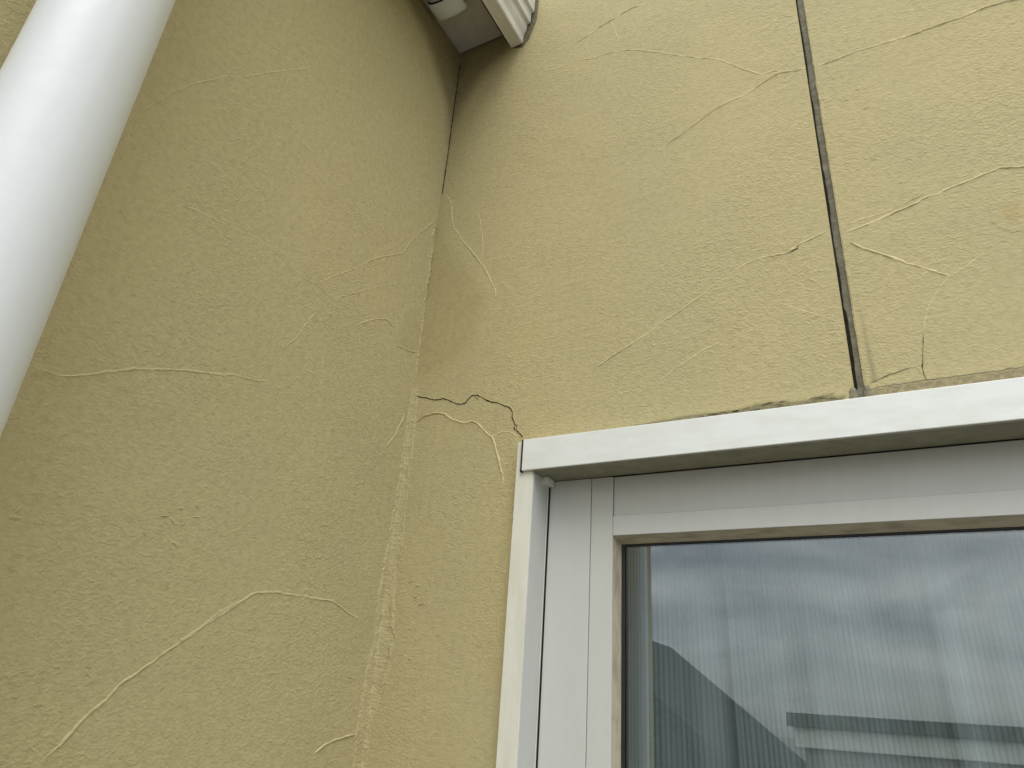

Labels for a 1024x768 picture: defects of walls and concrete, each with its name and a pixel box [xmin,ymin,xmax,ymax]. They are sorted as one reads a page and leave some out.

crack [596,165,1024,383]
crack [318,363,524,484]